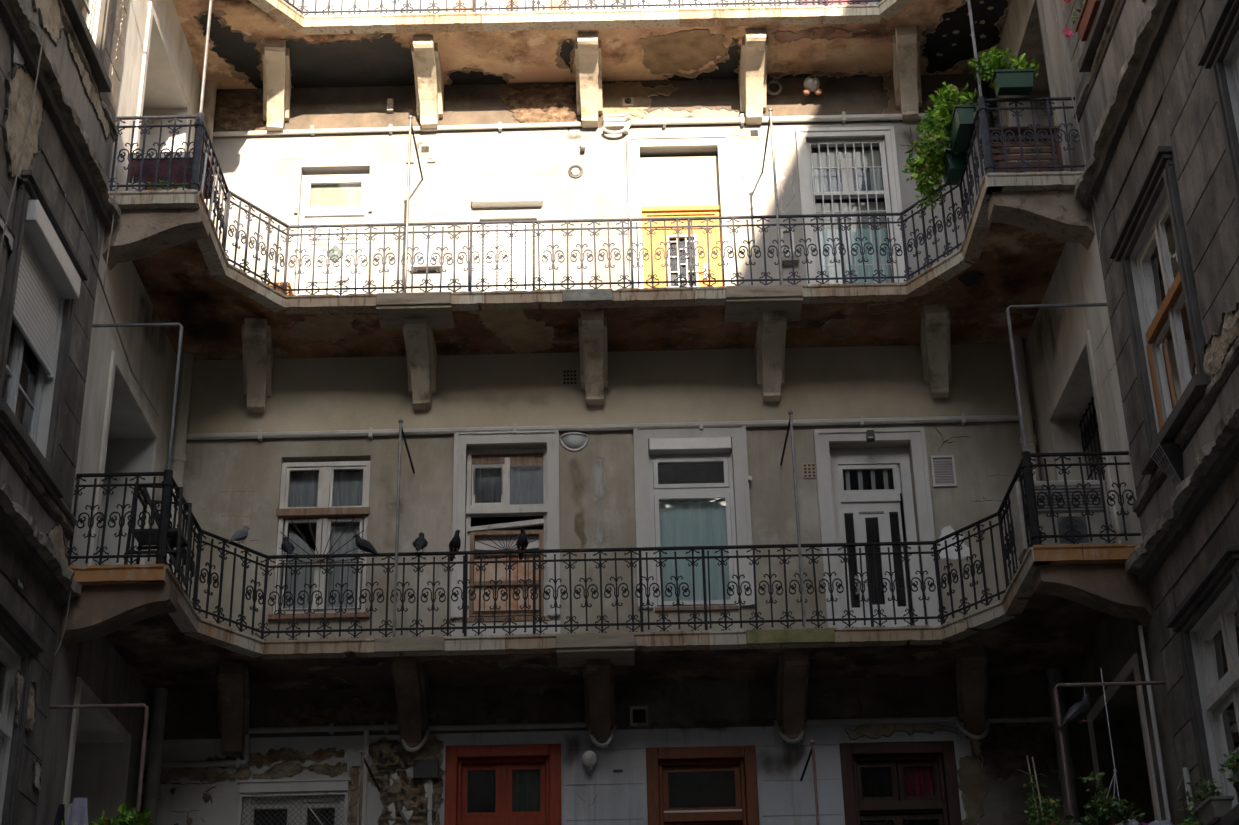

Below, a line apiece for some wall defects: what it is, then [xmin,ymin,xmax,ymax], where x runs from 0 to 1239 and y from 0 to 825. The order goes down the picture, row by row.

flaking render [3,37,45,181]
flaking render [193,5,267,132]
flaking render [600,28,742,120]
flaking render [920,0,1009,76]
peeling [735,138,795,214]
flaking render [1192,302,1239,382]
flaking render [140,697,445,825]